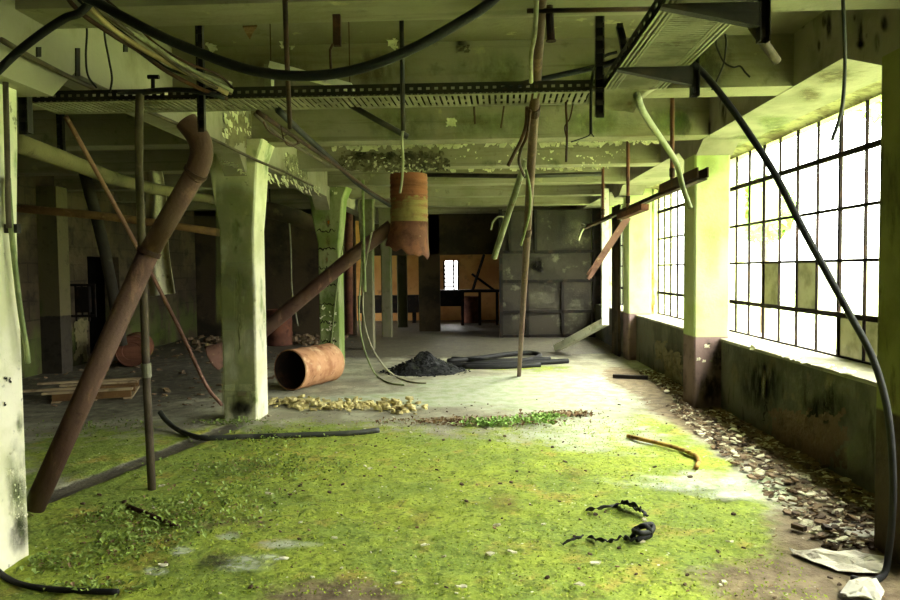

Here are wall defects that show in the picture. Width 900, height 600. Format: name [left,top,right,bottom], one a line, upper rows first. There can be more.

peeling [222,111,252,148]
peeling [268,152,321,197]
spalling [331,143,518,174]
peeling [537,140,659,171]
water stain [216,189,256,407]
water stain [743,363,778,405]
water stain [14,518,25,547]